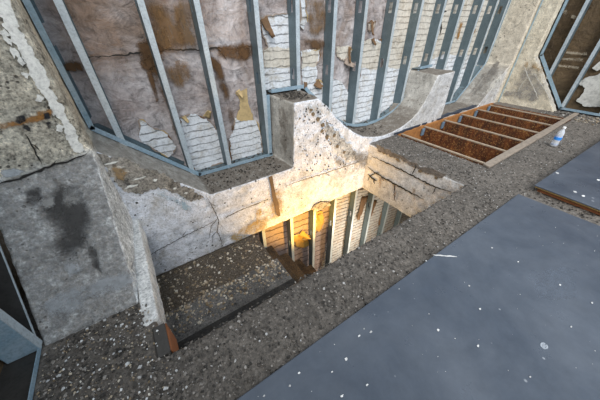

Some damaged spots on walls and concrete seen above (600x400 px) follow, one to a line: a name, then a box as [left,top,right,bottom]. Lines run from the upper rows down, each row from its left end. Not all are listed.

rust [0,110,52,128]
peeling [0,0,84,153]
crack [0,134,86,184]
water stain [137,1,196,107]
peeling [179,110,263,170]
water stain [210,43,253,99]
peeling [260,13,290,93]
peeling [331,79,348,122]
crack [286,156,451,199]
peeling [336,0,500,123]
water stain [26,185,101,272]
crack [151,199,268,255]